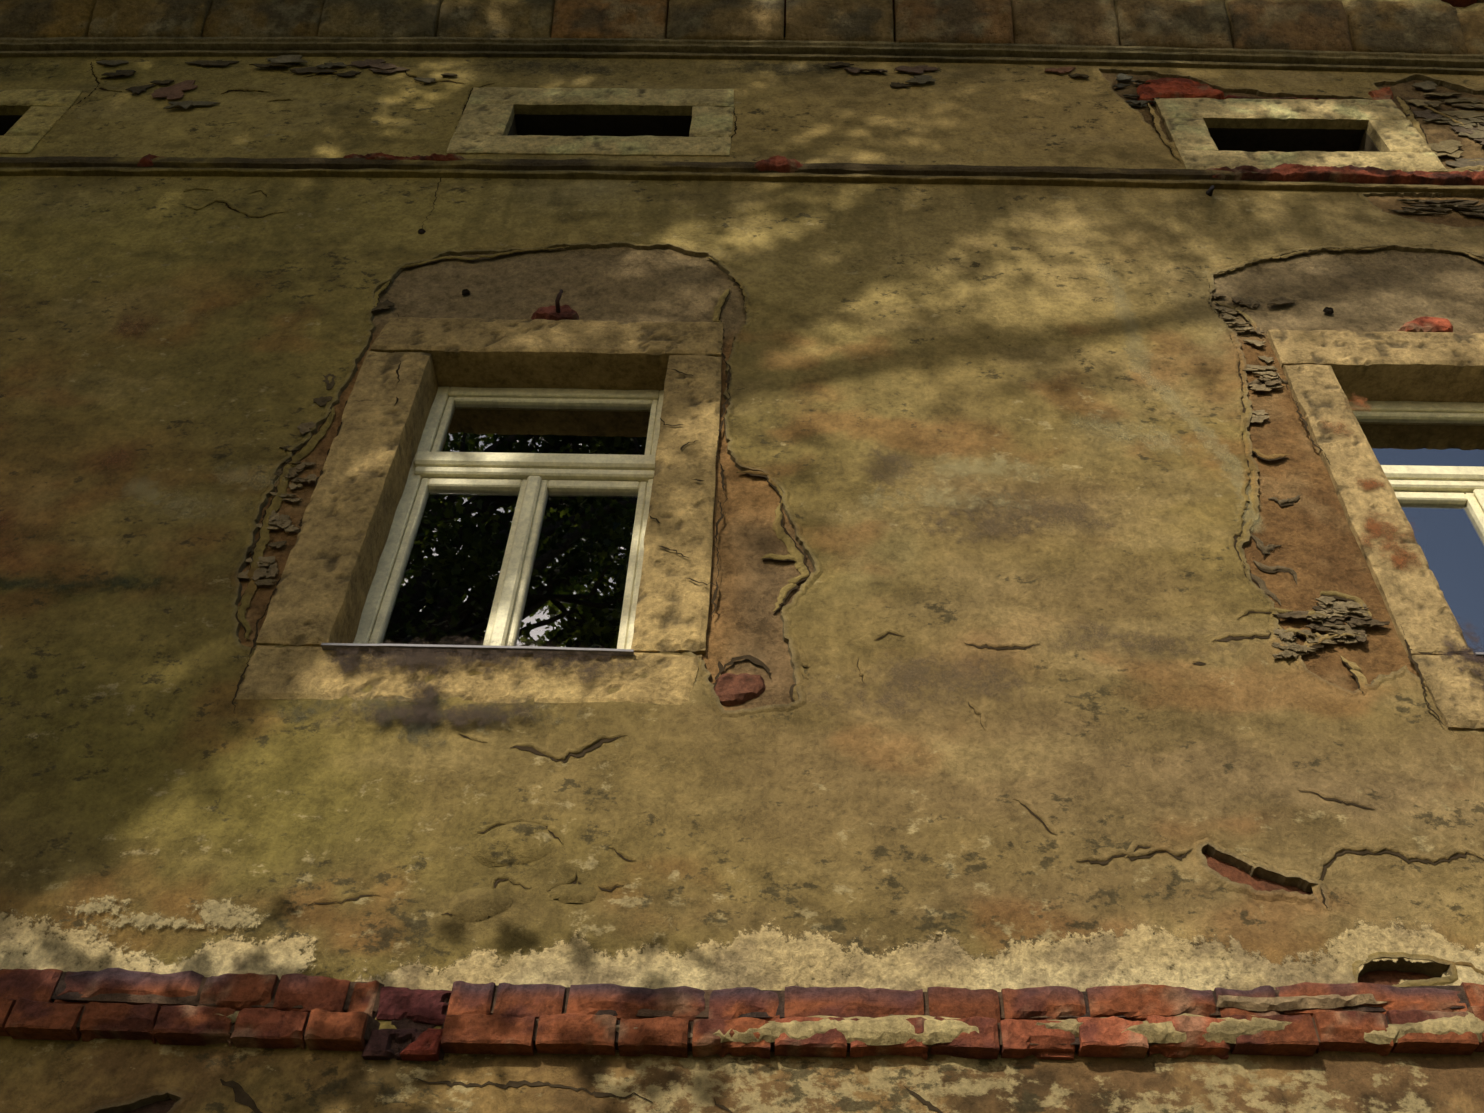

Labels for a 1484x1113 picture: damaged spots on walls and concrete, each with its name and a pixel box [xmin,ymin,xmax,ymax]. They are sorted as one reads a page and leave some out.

peeling [96,55,457,109]
flaking render [1045,67,1484,230]
flaking render [227,241,824,718]
flaking render [1206,243,1484,698]
crack [459,731,628,763]
crack [1298,787,1484,908]
flaking render [1352,952,1458,987]
flaking render [79,1084,194,1113]